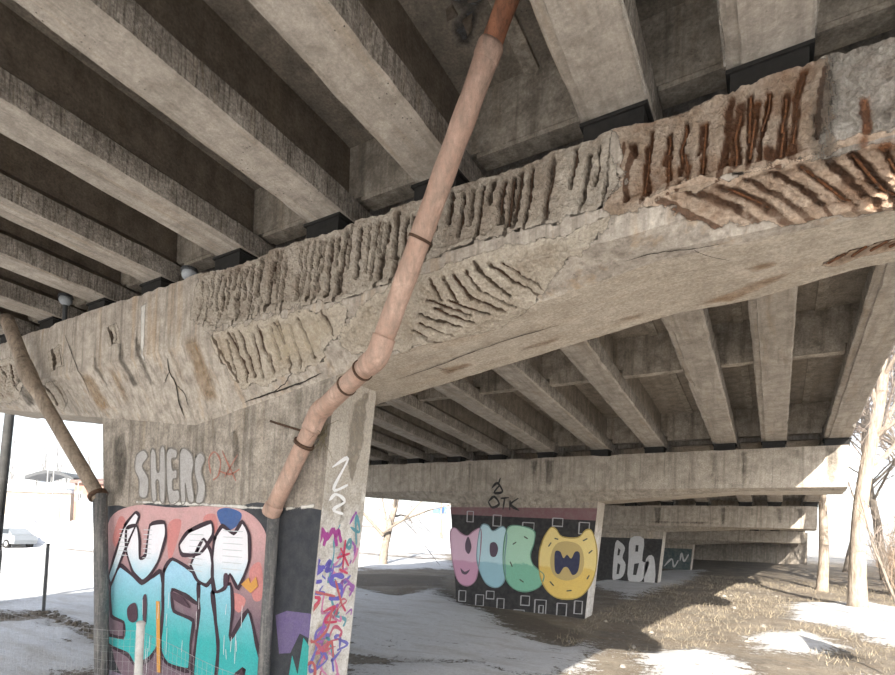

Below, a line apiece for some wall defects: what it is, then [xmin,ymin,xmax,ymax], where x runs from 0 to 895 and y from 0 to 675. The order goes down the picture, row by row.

damp [452,0,482,44]
spalling [392,37,895,353]
crack [627,244,730,261]
spalling [190,200,422,389]
spalling [0,357,23,403]
crack [165,358,188,418]
crack [246,373,321,402]